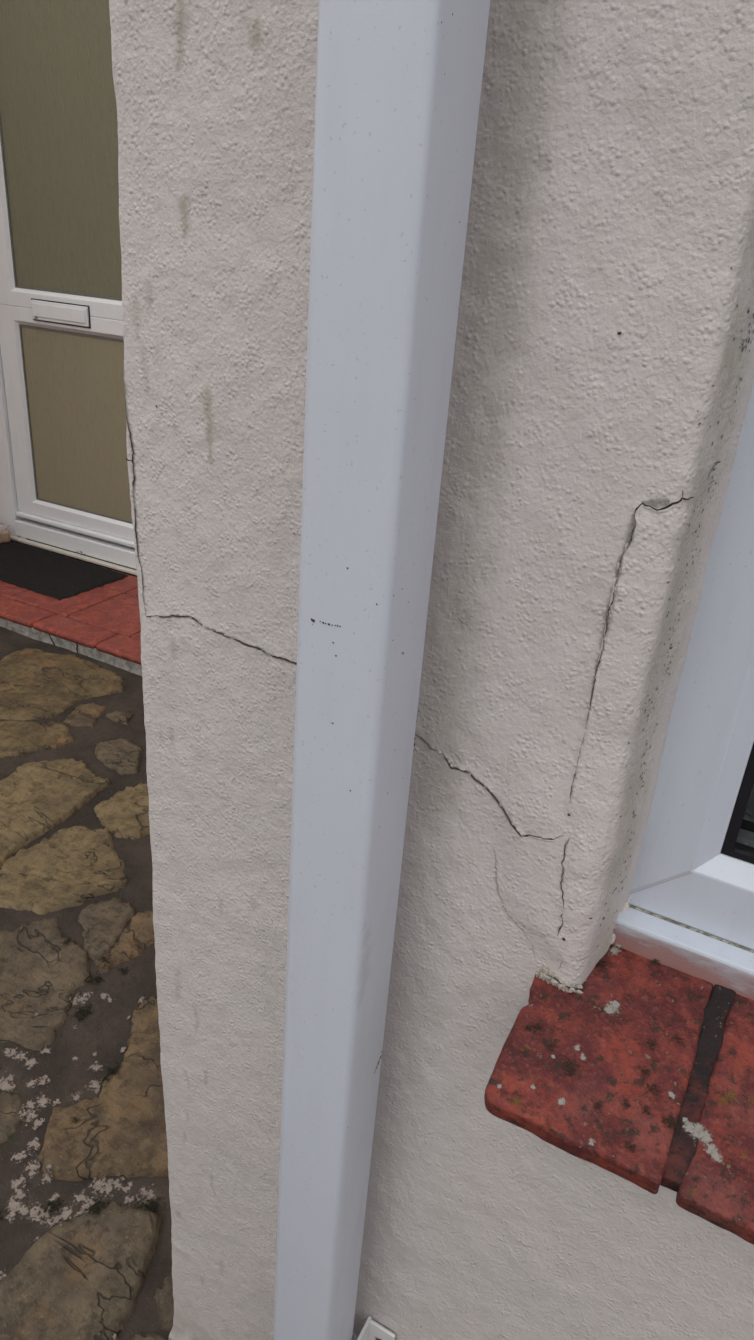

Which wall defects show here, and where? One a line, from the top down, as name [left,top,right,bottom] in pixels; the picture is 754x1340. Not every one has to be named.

crack [123,379,297,665]
crack [570,461,721,795]
leakage [630,463,717,794]
crack [415,734,569,969]